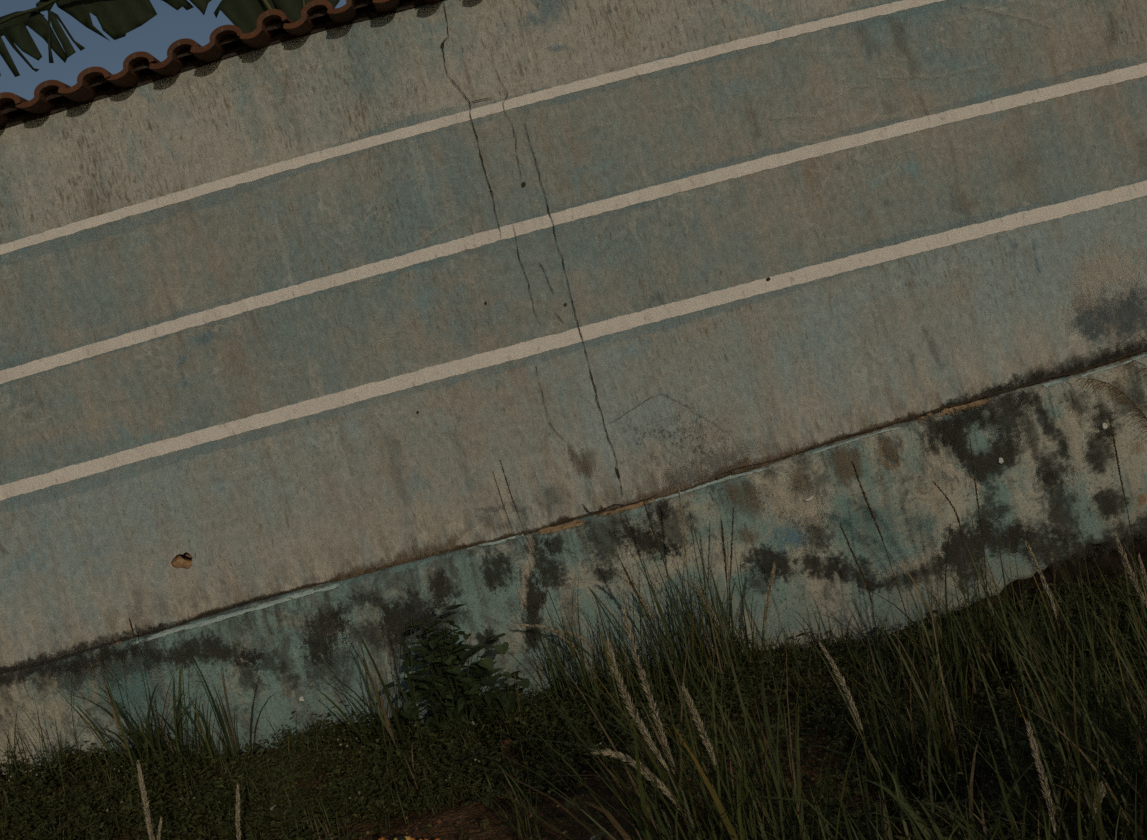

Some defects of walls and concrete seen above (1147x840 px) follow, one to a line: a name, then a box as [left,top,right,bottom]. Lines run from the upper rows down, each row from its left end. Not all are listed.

crack [441,0,731,533]
water stain [1074,288,1147,344]
water stain [740,382,1147,594]
water stain [0,631,296,689]
spalling [171,552,192,569]
water stain [301,568,465,664]
water stain [476,629,499,651]
water stain [480,532,565,653]
water stain [586,499,697,583]